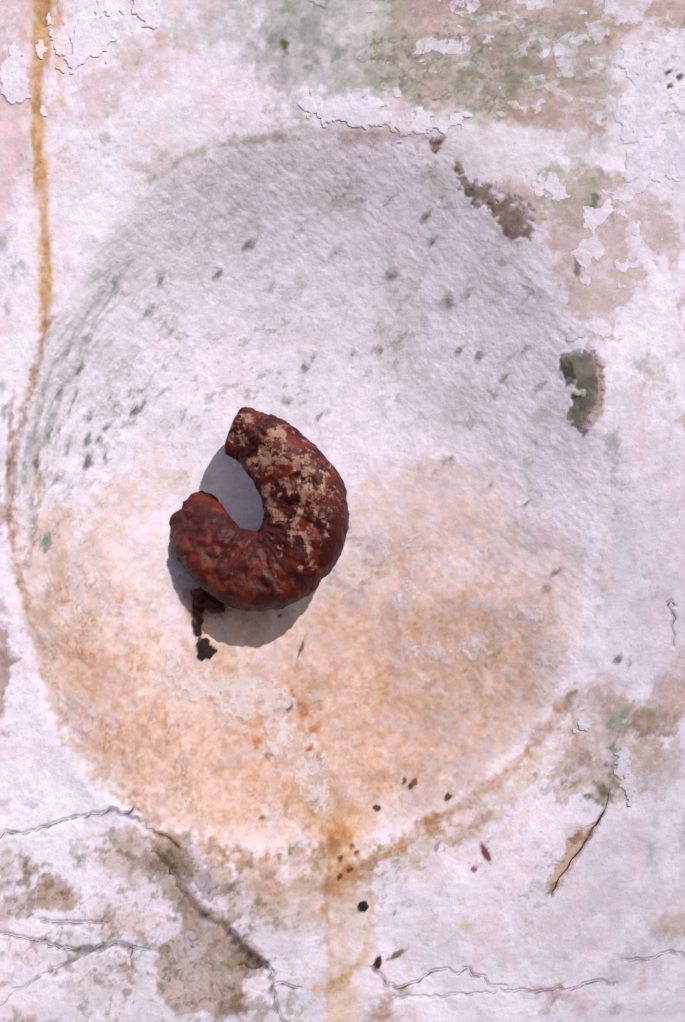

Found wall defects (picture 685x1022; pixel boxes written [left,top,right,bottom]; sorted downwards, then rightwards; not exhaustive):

corrosion [35,13,66,59]
peeling [0,42,32,104]
peeling [298,0,685,288]
spalling [560,352,606,436]
corrosion [192,603,217,661]
crack [1,806,295,1022]
crack [372,968,615,999]